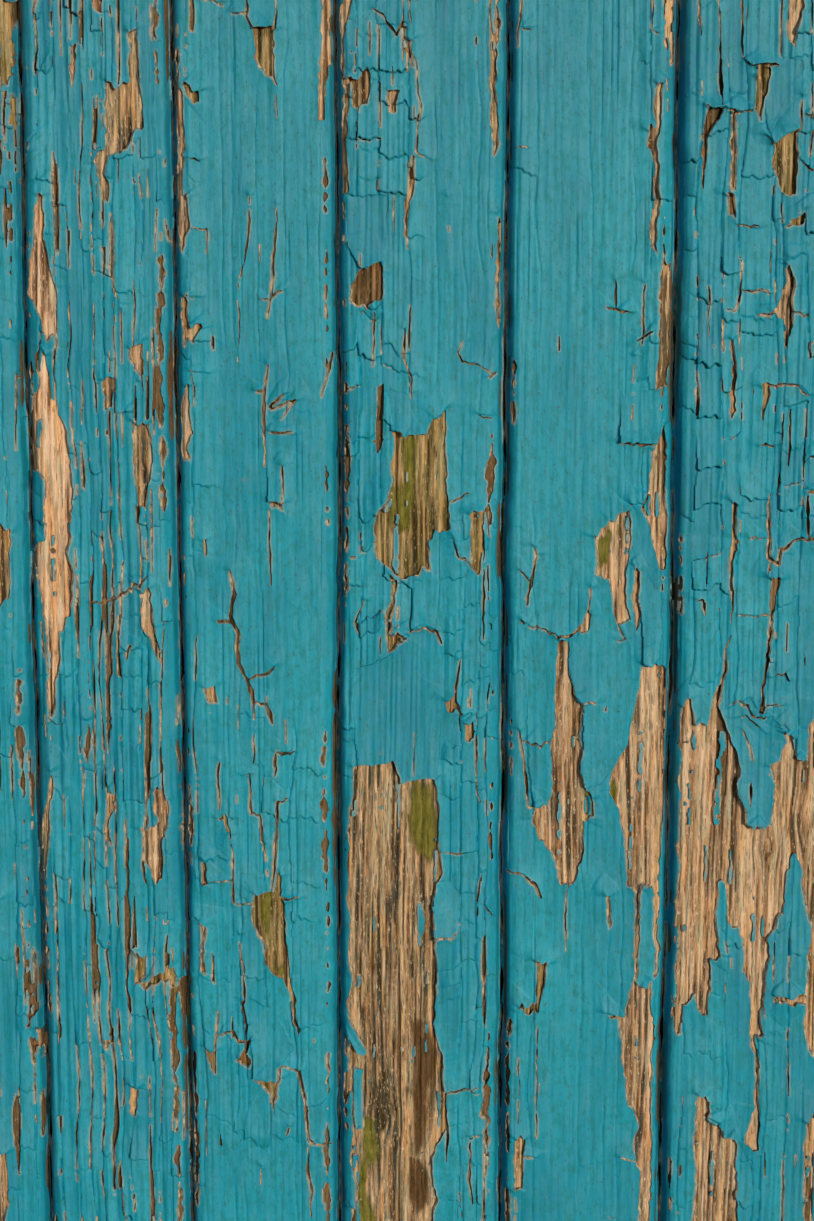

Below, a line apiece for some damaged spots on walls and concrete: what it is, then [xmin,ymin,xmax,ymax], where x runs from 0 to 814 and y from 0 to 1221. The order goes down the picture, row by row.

crack [719,5,779,104]
crack [239,210,280,339]
crack [607,279,653,342]
crack [257,376,296,437]
crack [768,490,814,565]
peeling [0,0,332,1221]
crack [453,539,489,639]
peeling [230,0,814,1221]
crack [217,580,296,900]
crack [476,870,566,930]
crack [215,979,251,1050]
crack [287,1069,339,1217]